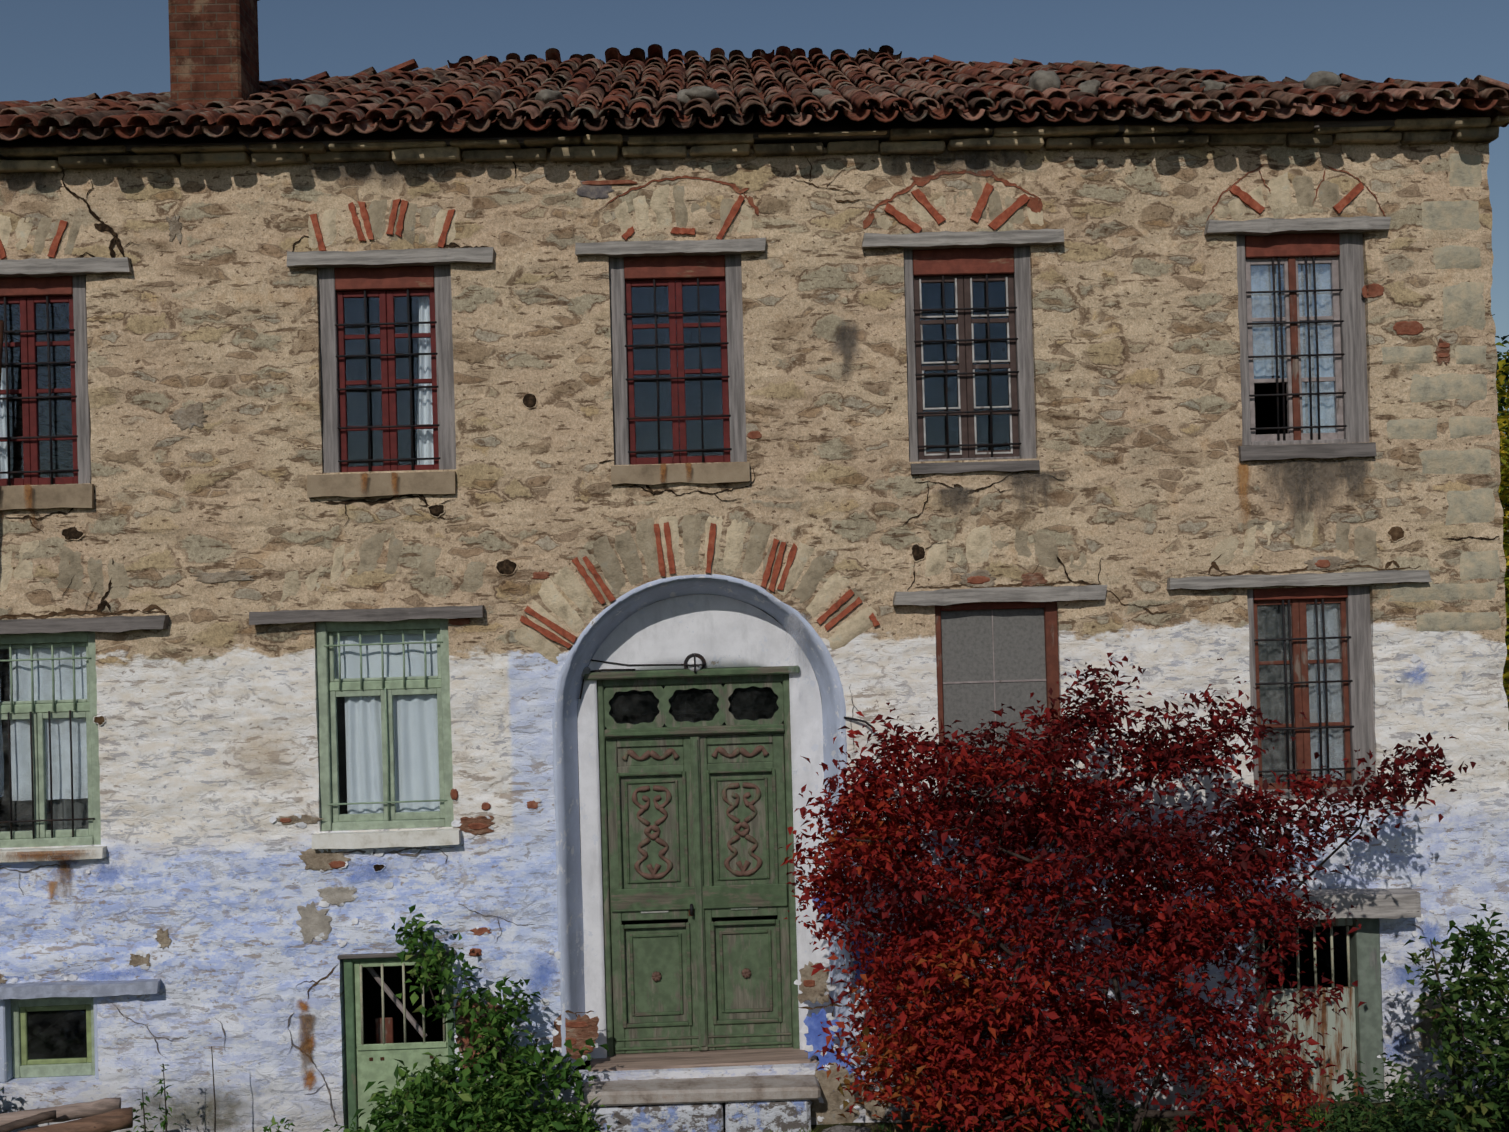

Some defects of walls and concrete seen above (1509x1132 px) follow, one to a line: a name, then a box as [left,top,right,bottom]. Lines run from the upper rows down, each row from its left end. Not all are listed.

crack [62,167,138,271]
crack [4,482,95,532]
crack [0,558,167,619]
spalling [269,813,323,829]
corrosion [14,850,85,897]
spalling [296,848,393,944]
peeling [0,973,42,984]
spalling [60,928,171,981]
peeling [852,931,885,990]
corrosion [298,1001,315,1089]
spalling [794,961,952,1124]